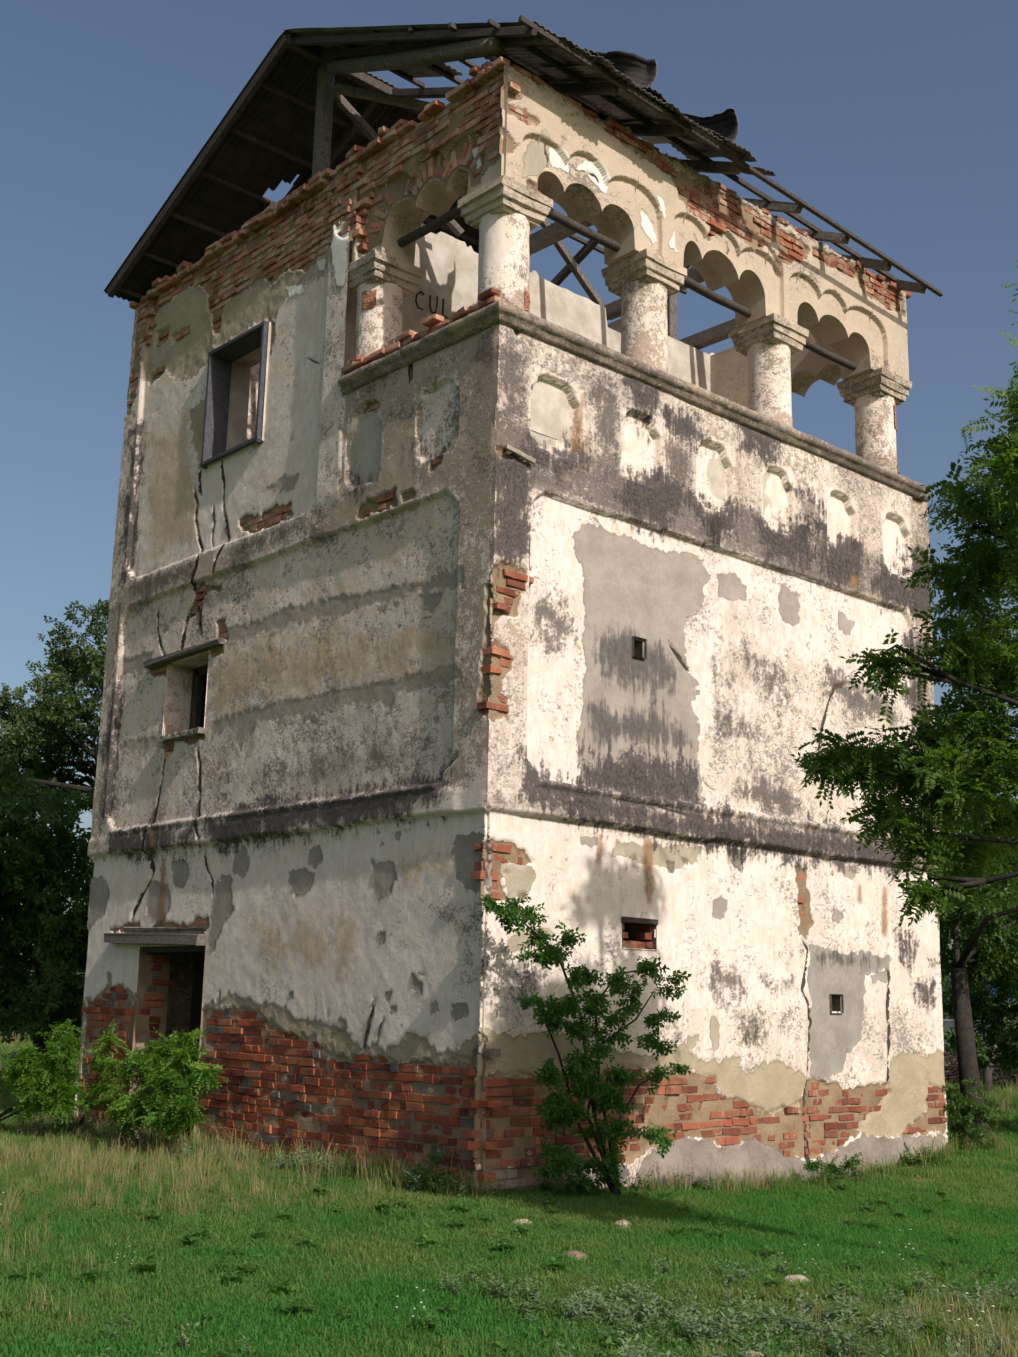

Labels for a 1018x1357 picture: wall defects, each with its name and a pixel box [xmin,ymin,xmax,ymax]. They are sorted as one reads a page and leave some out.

spalling [127,71,551,415]
crack [133,759,166,918]
crack [157,461,230,654]
water stain [96,671,452,870]
spalling [450,831,536,903]
spalling [476,561,534,722]
water stain [475,328,932,747]
water stain [513,629,926,885]
crack [818,683,844,756]
spalling [76,972,138,1132]
spalling [196,864,948,1191]
crack [801,940,812,1163]